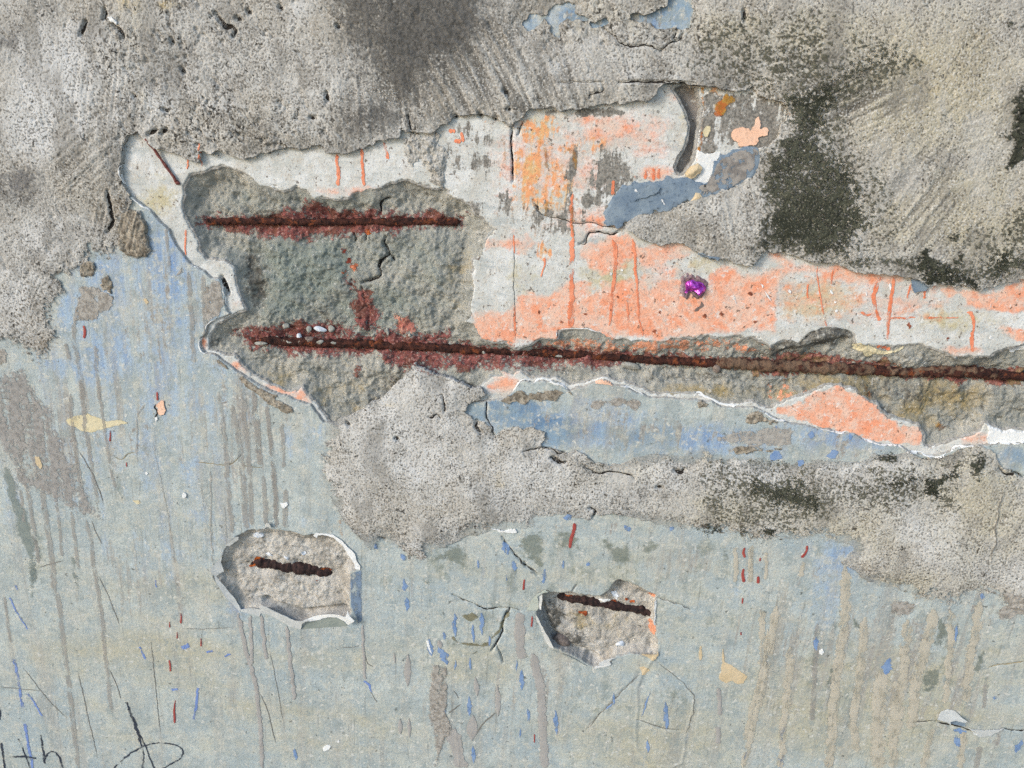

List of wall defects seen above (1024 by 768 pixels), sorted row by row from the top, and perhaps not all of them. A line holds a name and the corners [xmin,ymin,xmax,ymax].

leakage [686,8,1024,289]
peeling [118,82,1024,458]
corrosion [195,197,1024,387]
crack [523,447,631,476]
spalling [210,523,362,630]
crack [452,594,516,660]
peeling [492,528,517,581]
spalling [527,569,659,669]